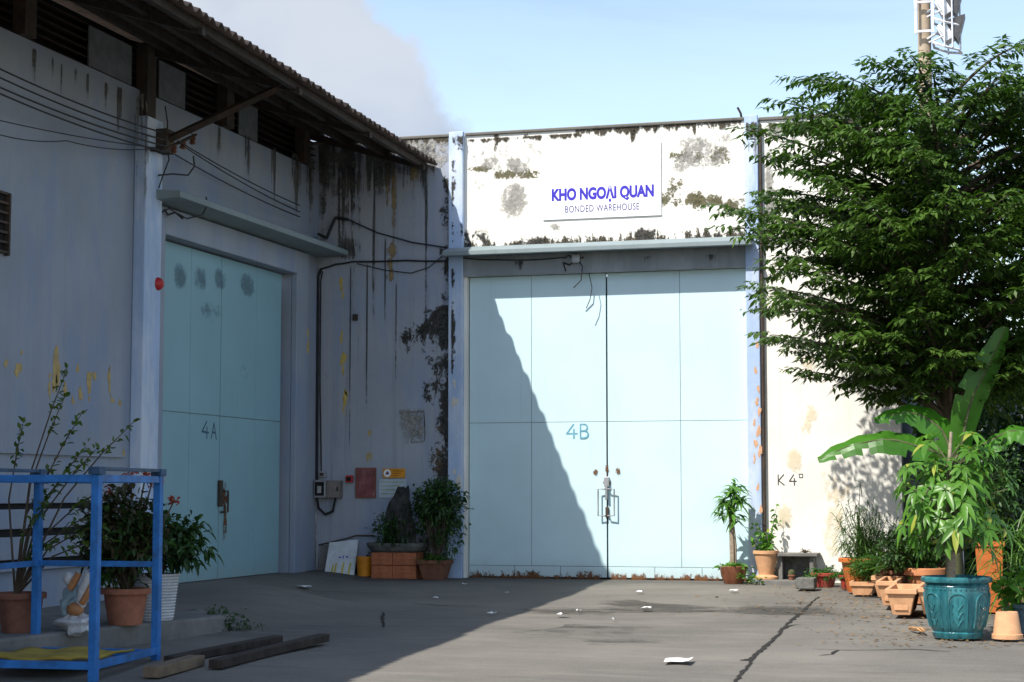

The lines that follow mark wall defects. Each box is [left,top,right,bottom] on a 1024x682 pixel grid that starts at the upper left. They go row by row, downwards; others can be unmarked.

damp [292,121,808,491]
peeling [48,345,121,406]
peeling [753,367,762,464]
corrosion [470,570,719,581]
crack [733,596,820,682]